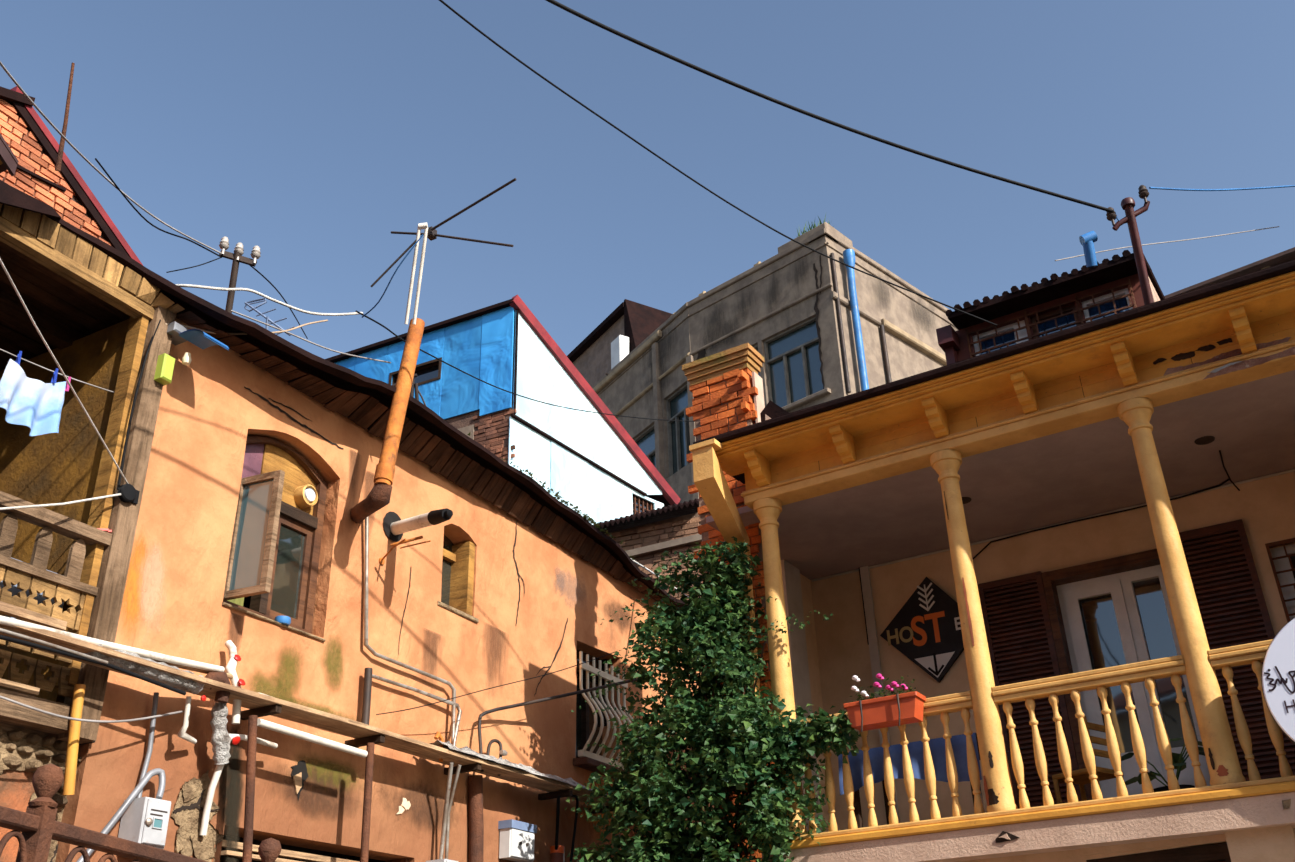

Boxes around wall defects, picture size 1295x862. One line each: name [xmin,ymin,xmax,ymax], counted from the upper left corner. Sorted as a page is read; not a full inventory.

peeling [1153,337,1295,380]
crack [244,386,344,449]
crack [513,522,525,624]
spalling [0,733,15,776]
spalling [171,770,224,862]
spalling [47,839,58,862]